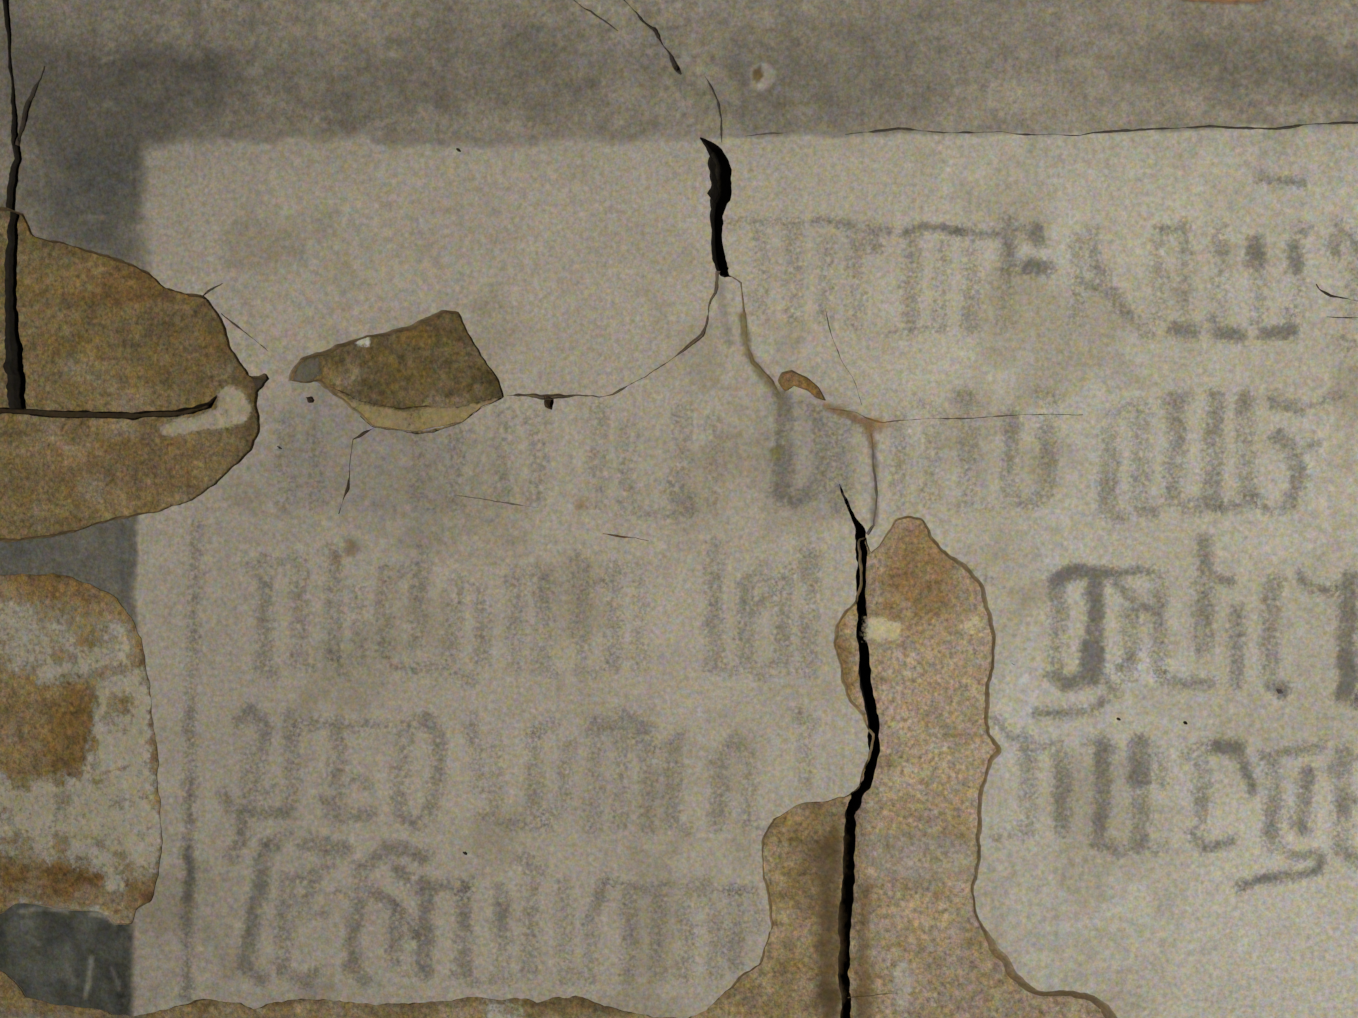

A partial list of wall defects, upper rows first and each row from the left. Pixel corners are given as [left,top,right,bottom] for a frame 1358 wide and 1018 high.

crack [845,121,1358,136]
crack [3,0,45,410]
crack [507,0,781,410]
flaking render [0,207,269,543]
crack [201,283,268,351]
flaking render [288,310,504,434]
crack [456,495,538,508]
crack [603,533,649,541]
flaking render [0,516,1117,1018]